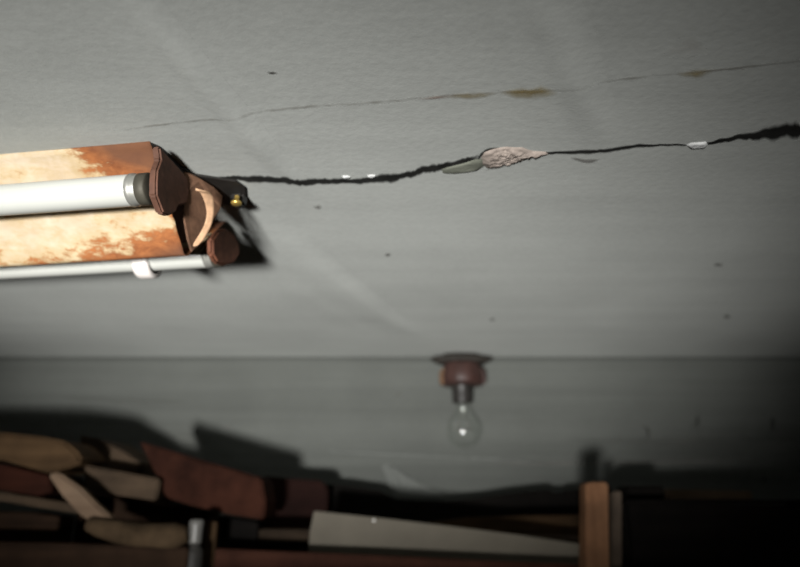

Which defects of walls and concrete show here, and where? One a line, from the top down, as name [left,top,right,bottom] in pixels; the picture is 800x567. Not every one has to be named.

crack [546,124,800,162]
crack [220,157,484,186]